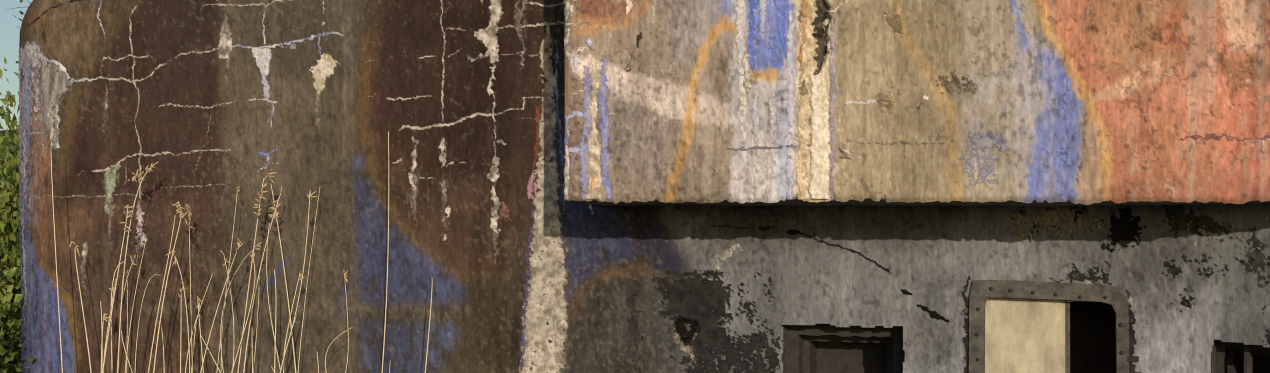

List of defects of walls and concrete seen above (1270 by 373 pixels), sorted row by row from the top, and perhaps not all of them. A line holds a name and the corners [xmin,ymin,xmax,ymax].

crack [27,0,345,198]
crack [368,0,589,135]
water stain [468,0,528,96]
crack [727,0,954,200]
peeling [18,41,72,326]
water stain [487,136,509,256]
water stain [1162,204,1270,318]